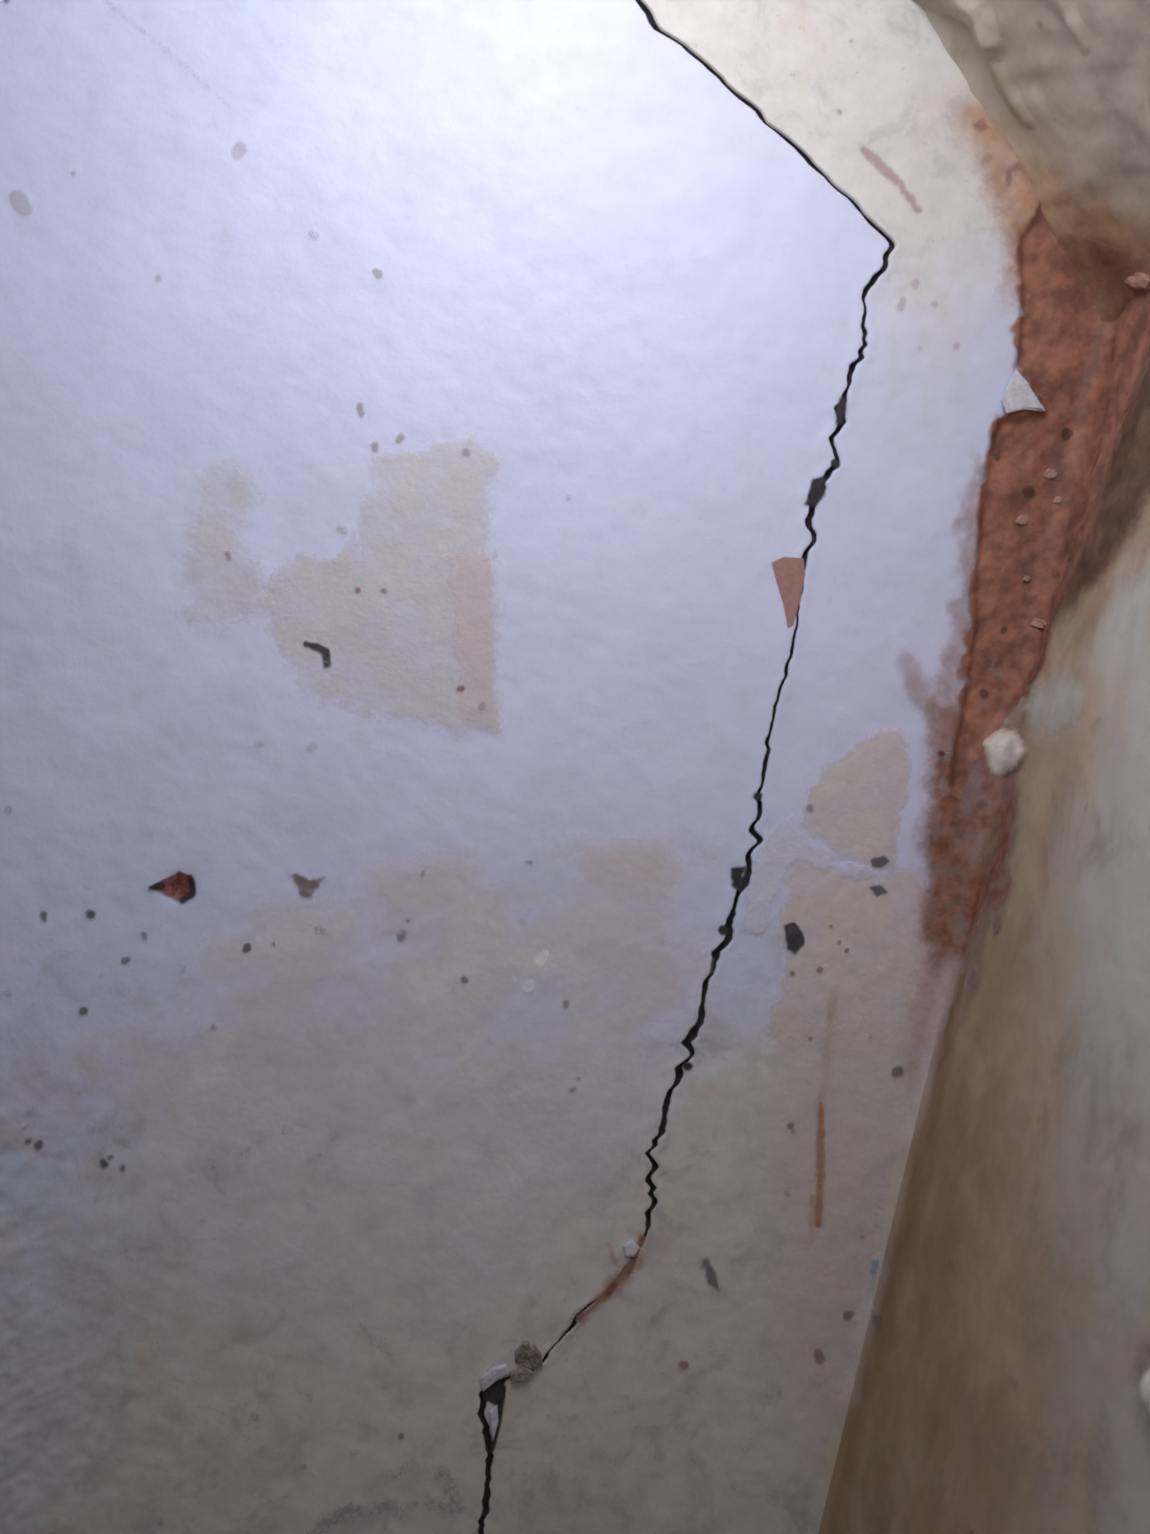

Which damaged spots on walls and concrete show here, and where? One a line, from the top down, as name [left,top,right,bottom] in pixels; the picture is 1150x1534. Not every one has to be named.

peeling [187,439,499,733]
crack [478,0,897,1534]
spalling [945,203,1150,798]
rust [810,1095,825,1235]